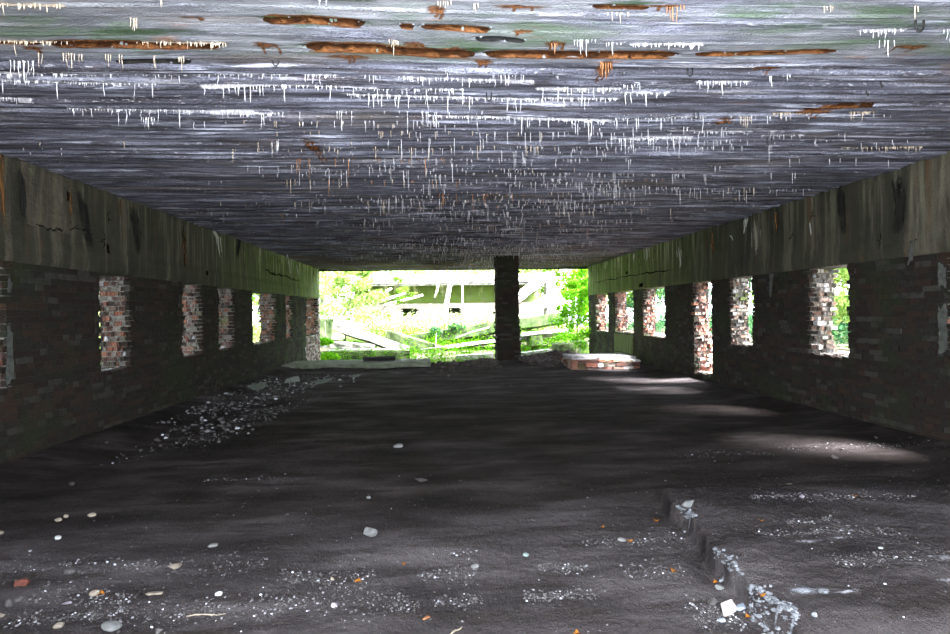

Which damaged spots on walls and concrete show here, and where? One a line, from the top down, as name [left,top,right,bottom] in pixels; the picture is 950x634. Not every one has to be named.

efflorescence [0,2,65,10]
efflorescence [0,71,670,124]
water stain [696,80,769,94]
efflorescence [609,116,805,141]
water stain [837,188,846,231]
water stain [892,179,905,231]